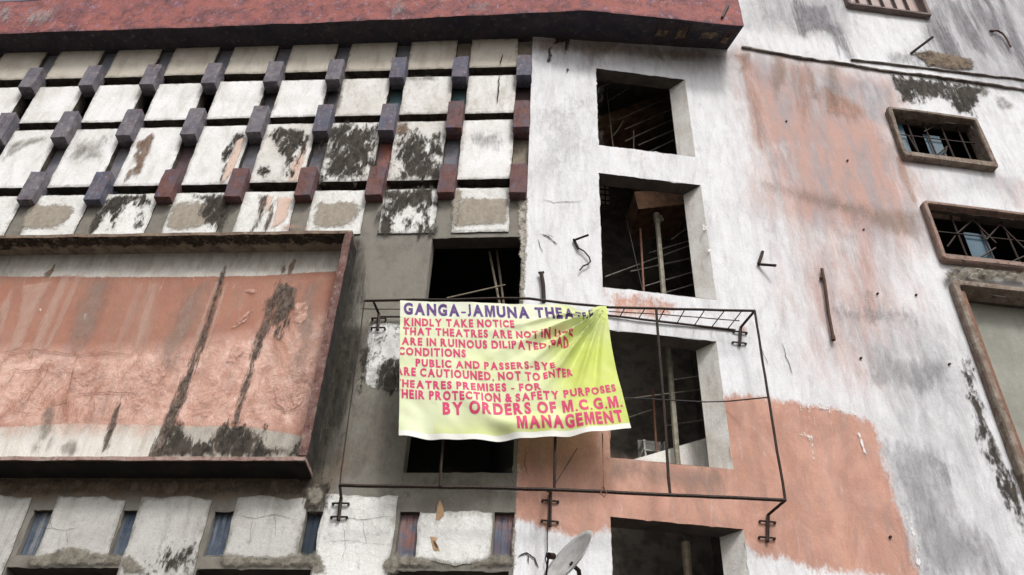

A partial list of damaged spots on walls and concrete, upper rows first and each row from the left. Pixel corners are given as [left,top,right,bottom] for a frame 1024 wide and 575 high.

spalling [914,50,974,70]
peeling [222,138,243,182]
water stain [267,121,446,238]
peeling [313,200,360,228]
water stain [0,192,400,513]
peeling [365,322,400,390]
water stain [962,359,1024,525]
water stain [157,542,197,572]